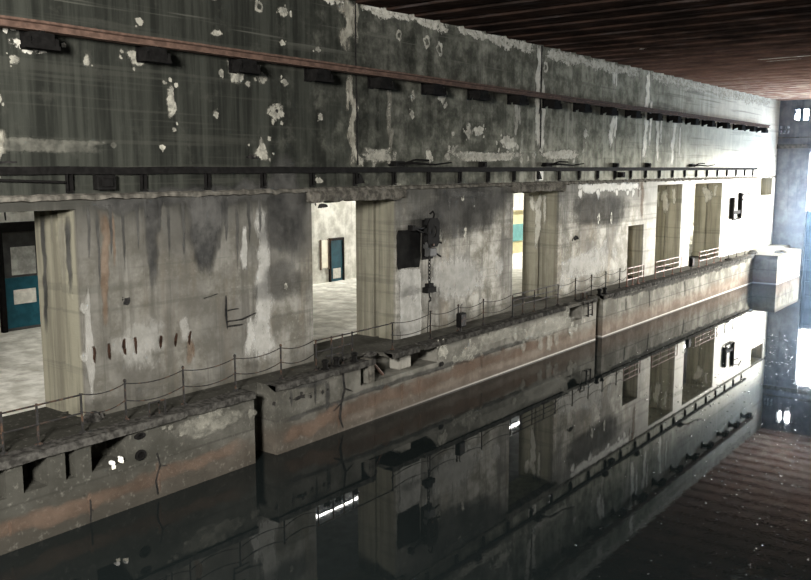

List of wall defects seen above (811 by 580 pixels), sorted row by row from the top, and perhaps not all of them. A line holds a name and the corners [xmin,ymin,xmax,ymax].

spalling [162,77,178,132]
spalling [267,103,284,125]
spalling [246,136,274,162]
spalling [359,148,397,167]
damp [87,162,304,283]
damp [576,198,624,224]